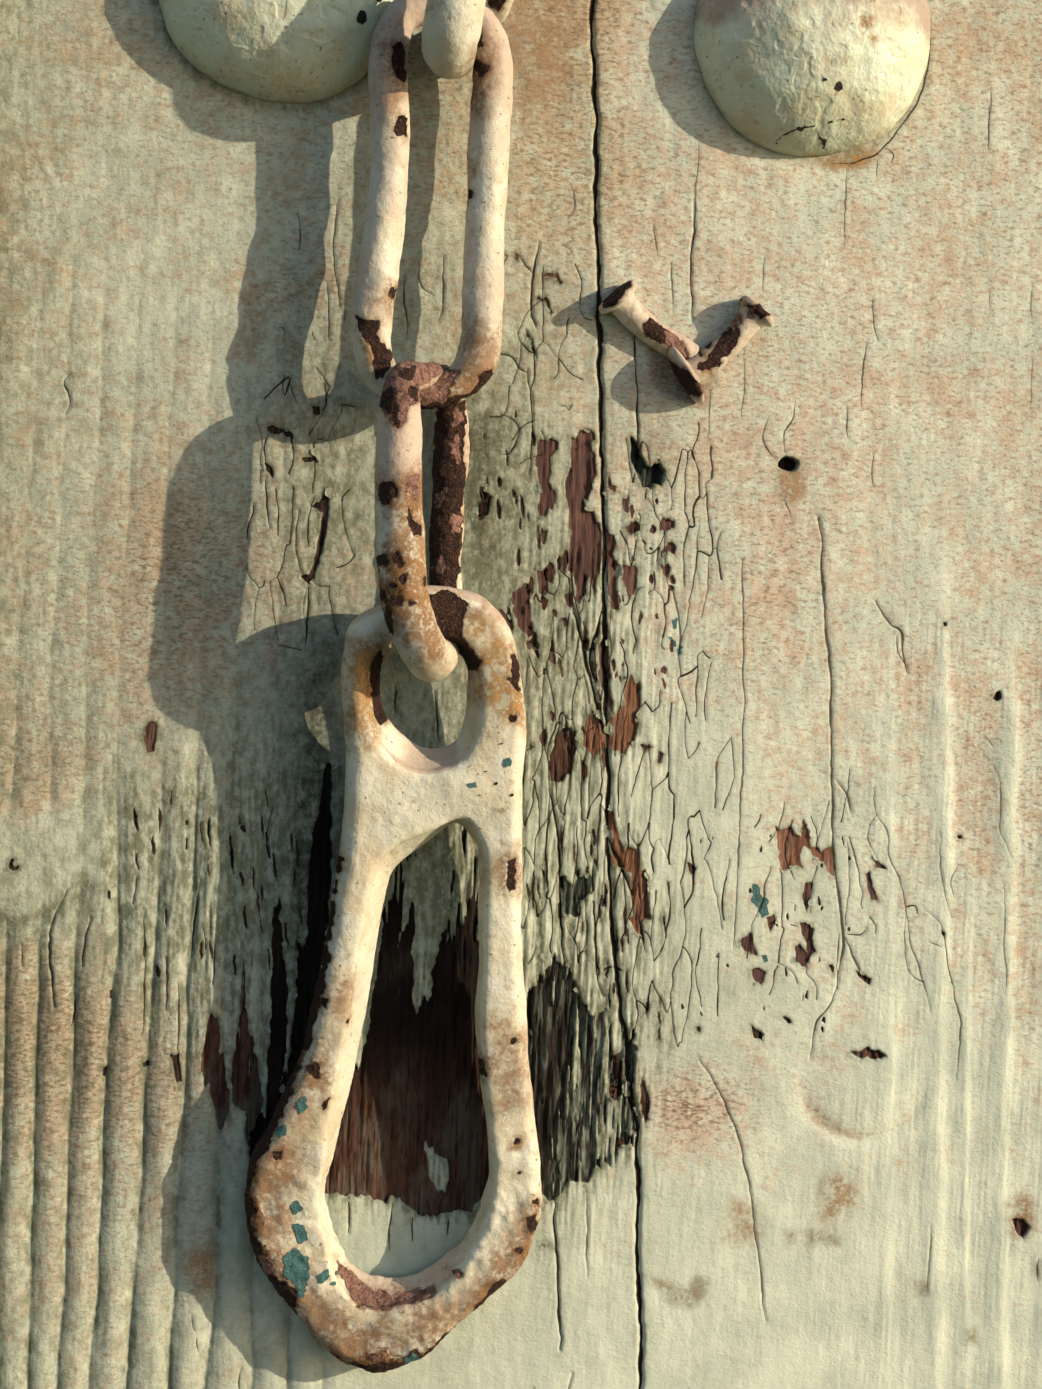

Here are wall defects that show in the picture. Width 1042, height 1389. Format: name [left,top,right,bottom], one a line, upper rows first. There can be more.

rust [601,281,632,308]
rust [643,299,770,404]
peeling [301,486,335,588]
peeling [469,428,676,782]
crack [485,0,962,1389]
peeling [198,955,264,1155]
peeling [325,827,489,1221]
peeling [526,805,666,1006]
peeling [608,1053,650,1149]
peeling [736,933,766,987]
peeling [760,819,851,977]
peeling [866,853,886,901]